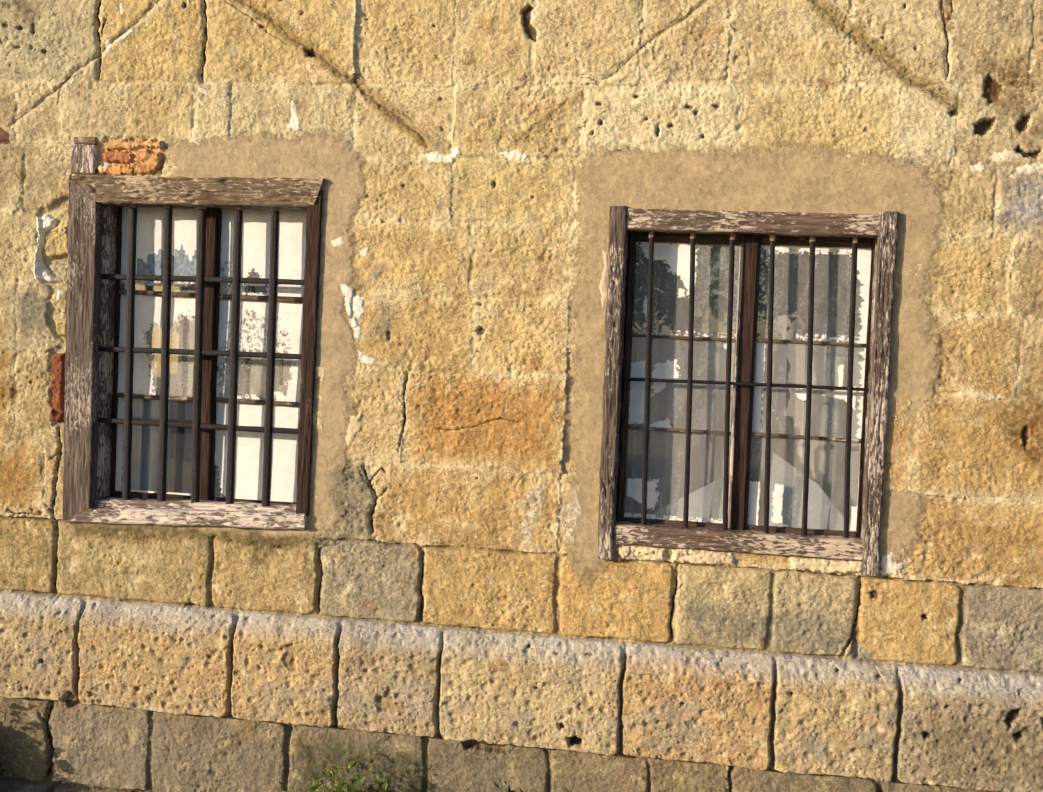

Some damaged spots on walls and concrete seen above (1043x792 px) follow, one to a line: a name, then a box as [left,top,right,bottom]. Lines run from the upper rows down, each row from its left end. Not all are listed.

flaking render [98,137,166,176]
spalling [33,214,68,337]
peeling [341,284,377,364]
flaking render [50,352,66,423]
crack [395,378,408,447]
crack [438,418,520,431]
crack [362,466,383,529]